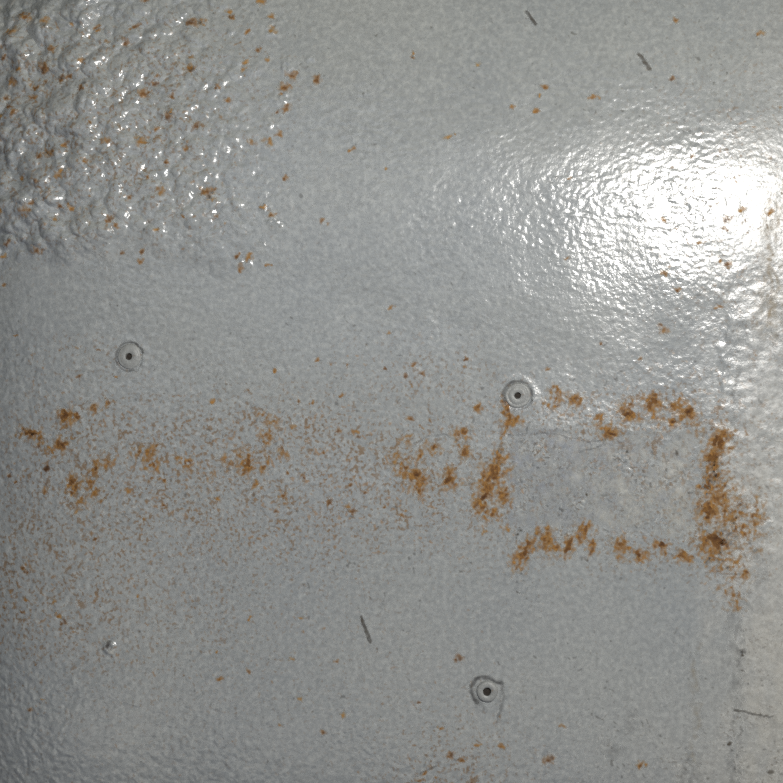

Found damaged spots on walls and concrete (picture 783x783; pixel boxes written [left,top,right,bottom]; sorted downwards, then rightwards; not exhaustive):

corrosion [500,400,524,439]
corrosion [543,385,583,408]
corrosion [594,414,618,440]
corrosion [644,393,695,427]
corrosion [65,459,116,513]
corrosion [134,445,166,482]
corrosion [223,450,270,488]
corrosion [394,445,436,494]
corrosion [472,450,511,520]
corrosion [614,429,764,608]
corrosion [513,521,596,570]